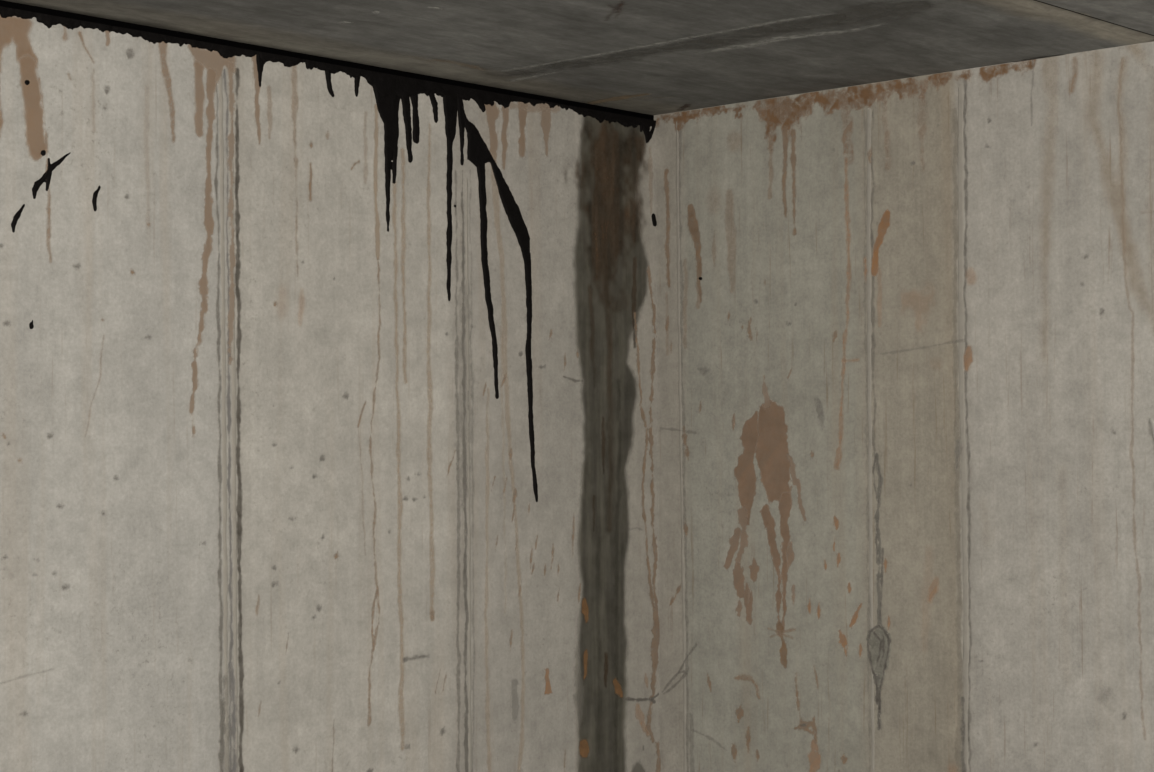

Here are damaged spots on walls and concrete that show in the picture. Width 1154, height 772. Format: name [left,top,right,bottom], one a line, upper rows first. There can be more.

leakage [502,1,934,81]
rust [656,59,1036,250]
leakage [0,6,656,772]
leakage [724,383,806,668]
leakage [794,717,820,772]